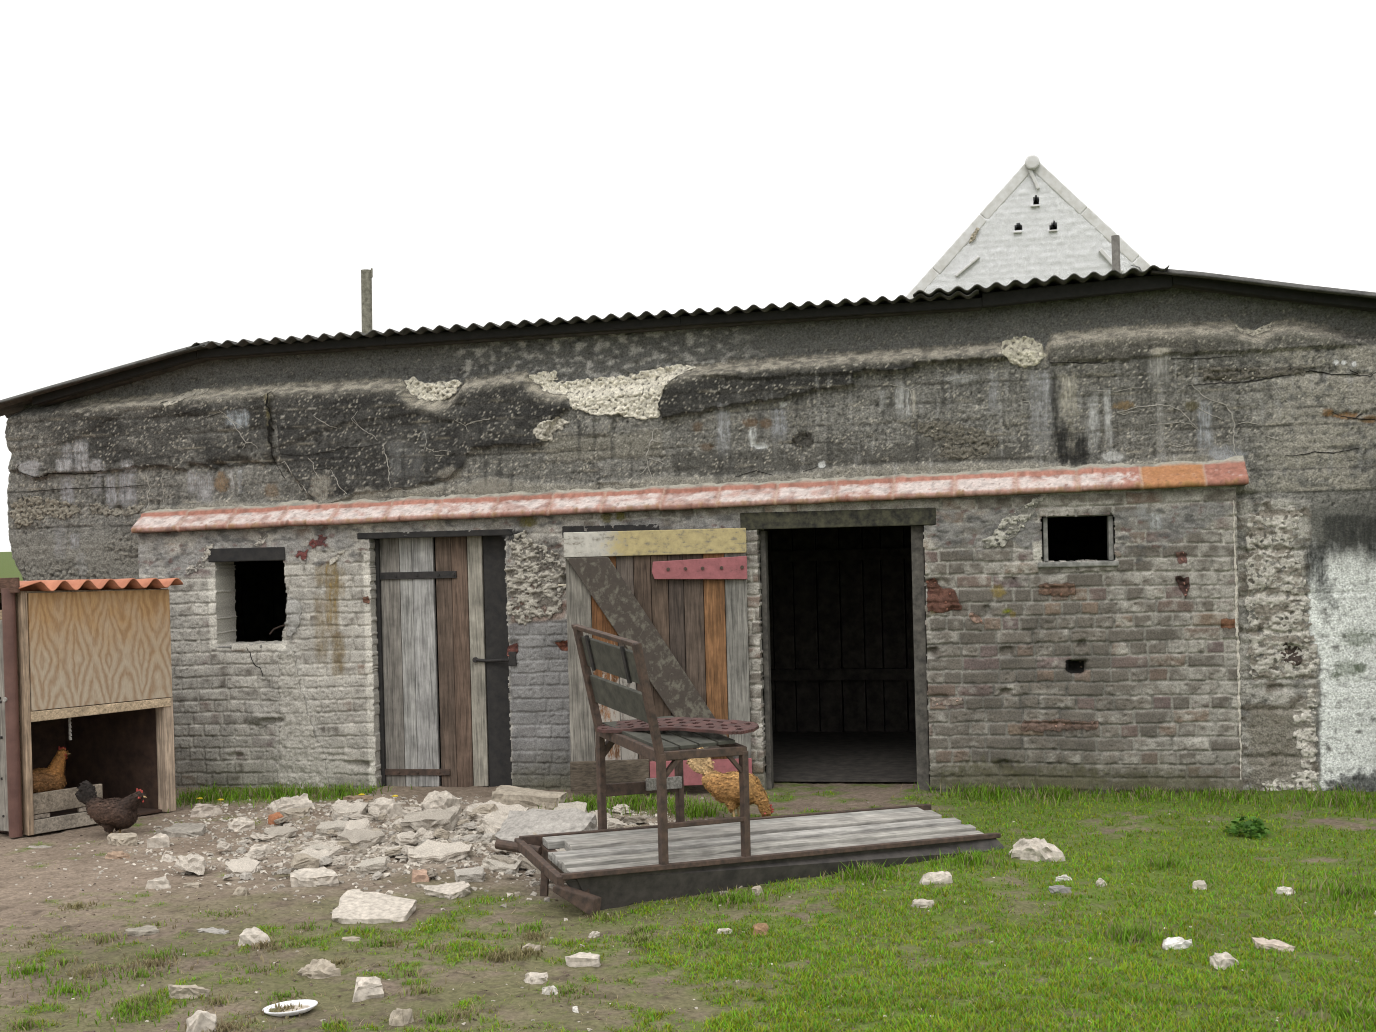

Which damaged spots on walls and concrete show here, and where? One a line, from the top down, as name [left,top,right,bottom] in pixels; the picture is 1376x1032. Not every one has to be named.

spalling [1000,336,1048,368]
spalling [404,377,461,401]
spalling [529,364,696,441]
water stain [1305,515,1376,581]
spalling [926,578,984,624]
water stain [1325,770,1376,792]